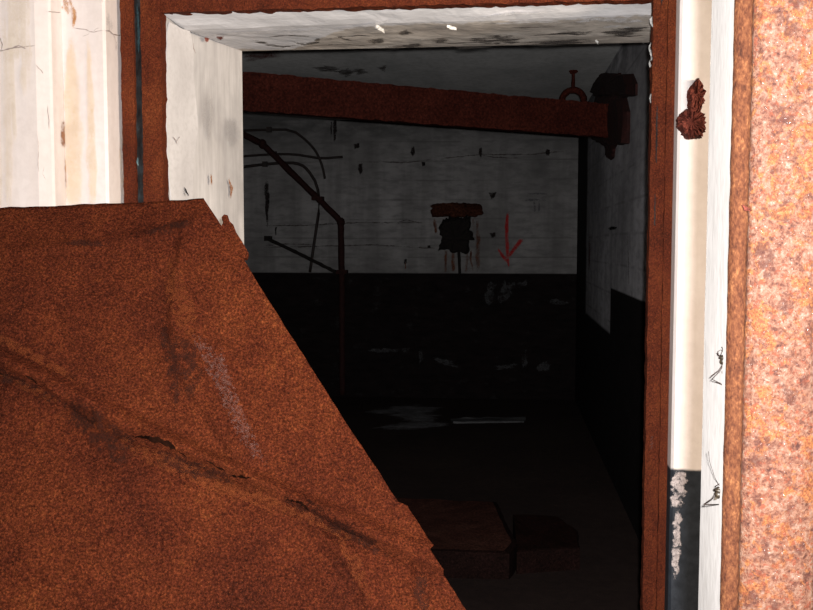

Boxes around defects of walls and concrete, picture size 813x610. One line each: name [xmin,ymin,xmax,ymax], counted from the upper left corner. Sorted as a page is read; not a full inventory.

crack [0,38,43,73]
rust [62,0,77,27]
rust [61,37,98,205]
rust [120,438,370,598]
peeling [670,471,688,577]